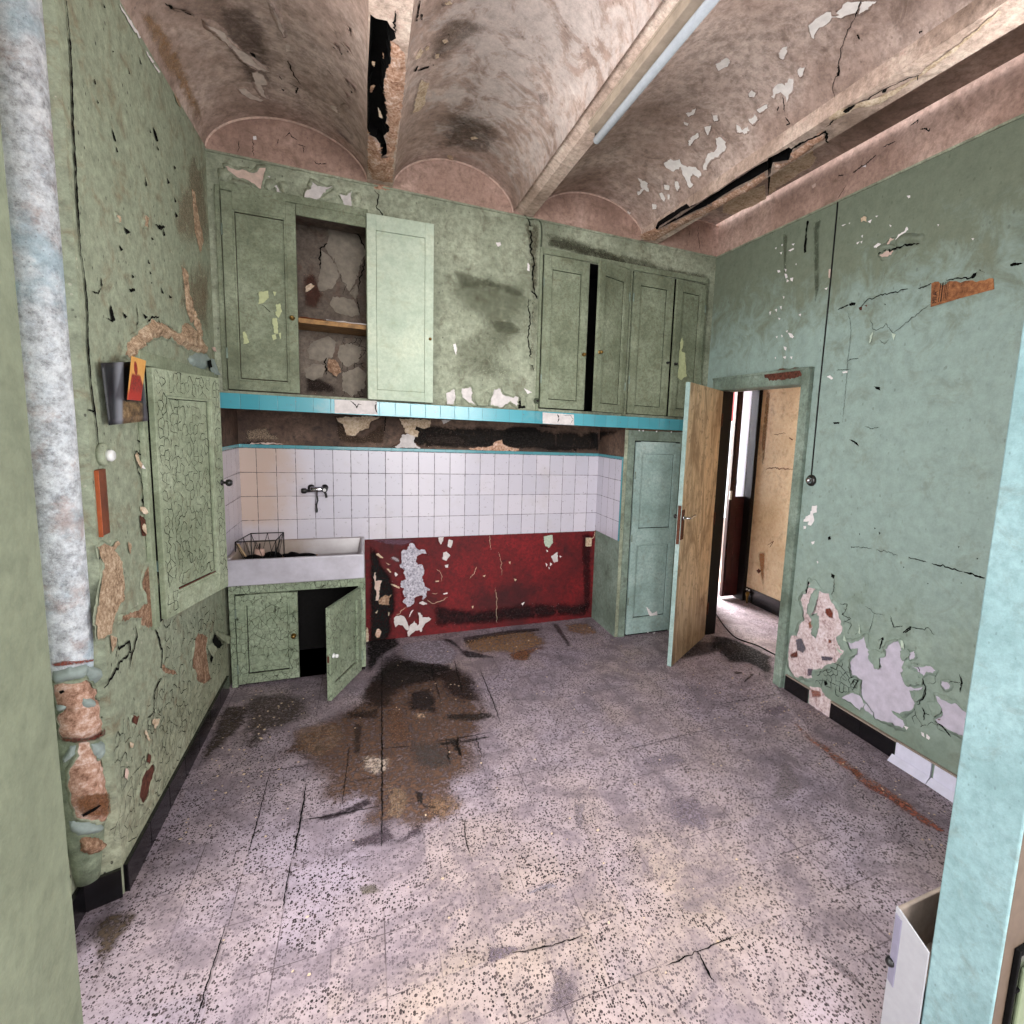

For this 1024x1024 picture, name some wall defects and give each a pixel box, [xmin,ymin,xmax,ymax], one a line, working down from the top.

spalling [303,11,450,216]
crack [638,11,1001,248]
crack [66,0,99,445]
peeling [304,336,381,437]
spalling [392,417,451,449]
crack [825,269,985,446]
peeling [366,537,453,642]
peeling [786,577,967,739]
spalling [52,677,111,855]
crack [248,653,408,909]
rust [797,725,944,831]
crack [666,936,733,982]